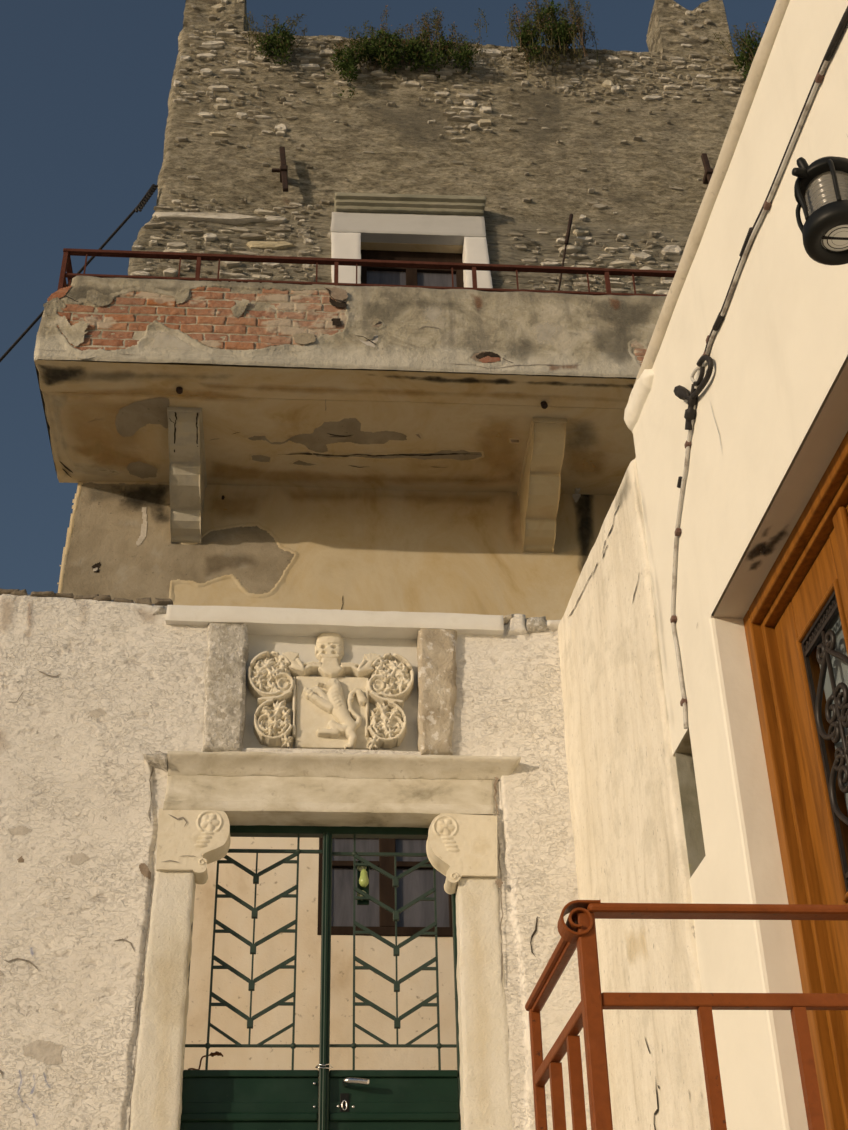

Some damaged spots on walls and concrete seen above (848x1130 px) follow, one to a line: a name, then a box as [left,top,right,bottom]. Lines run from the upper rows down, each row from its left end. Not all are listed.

flaking render [43,281,386,360]
flaking render [465,349,513,367]
flaking render [115,397,170,437]
flaking render [243,415,411,463]
damp [123,484,166,520]
flaking render [57,461,300,604]
damp [572,488,592,569]
crack [494,777,503,991]
crack [530,916,539,957]
crack [645,1039,659,1130]